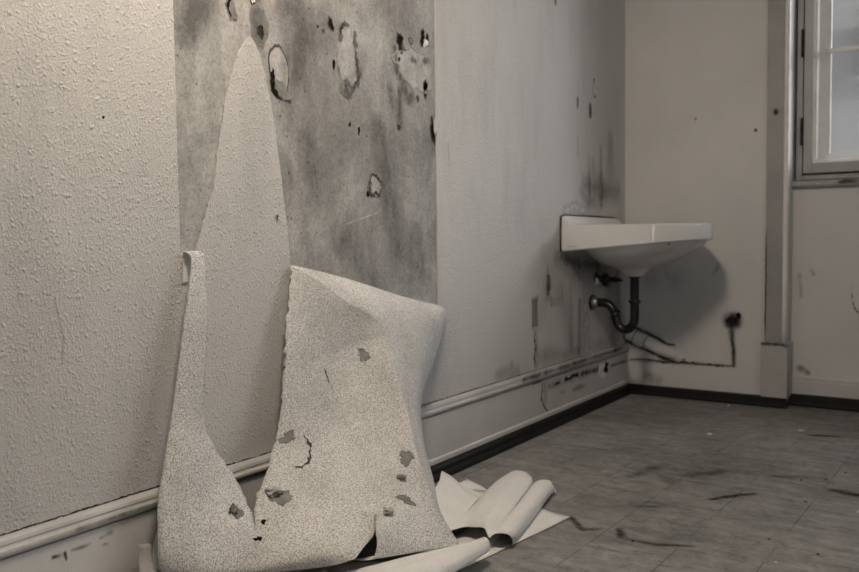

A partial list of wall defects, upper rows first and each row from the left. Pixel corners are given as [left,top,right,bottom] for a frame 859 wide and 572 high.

peeling [173,0,439,465]